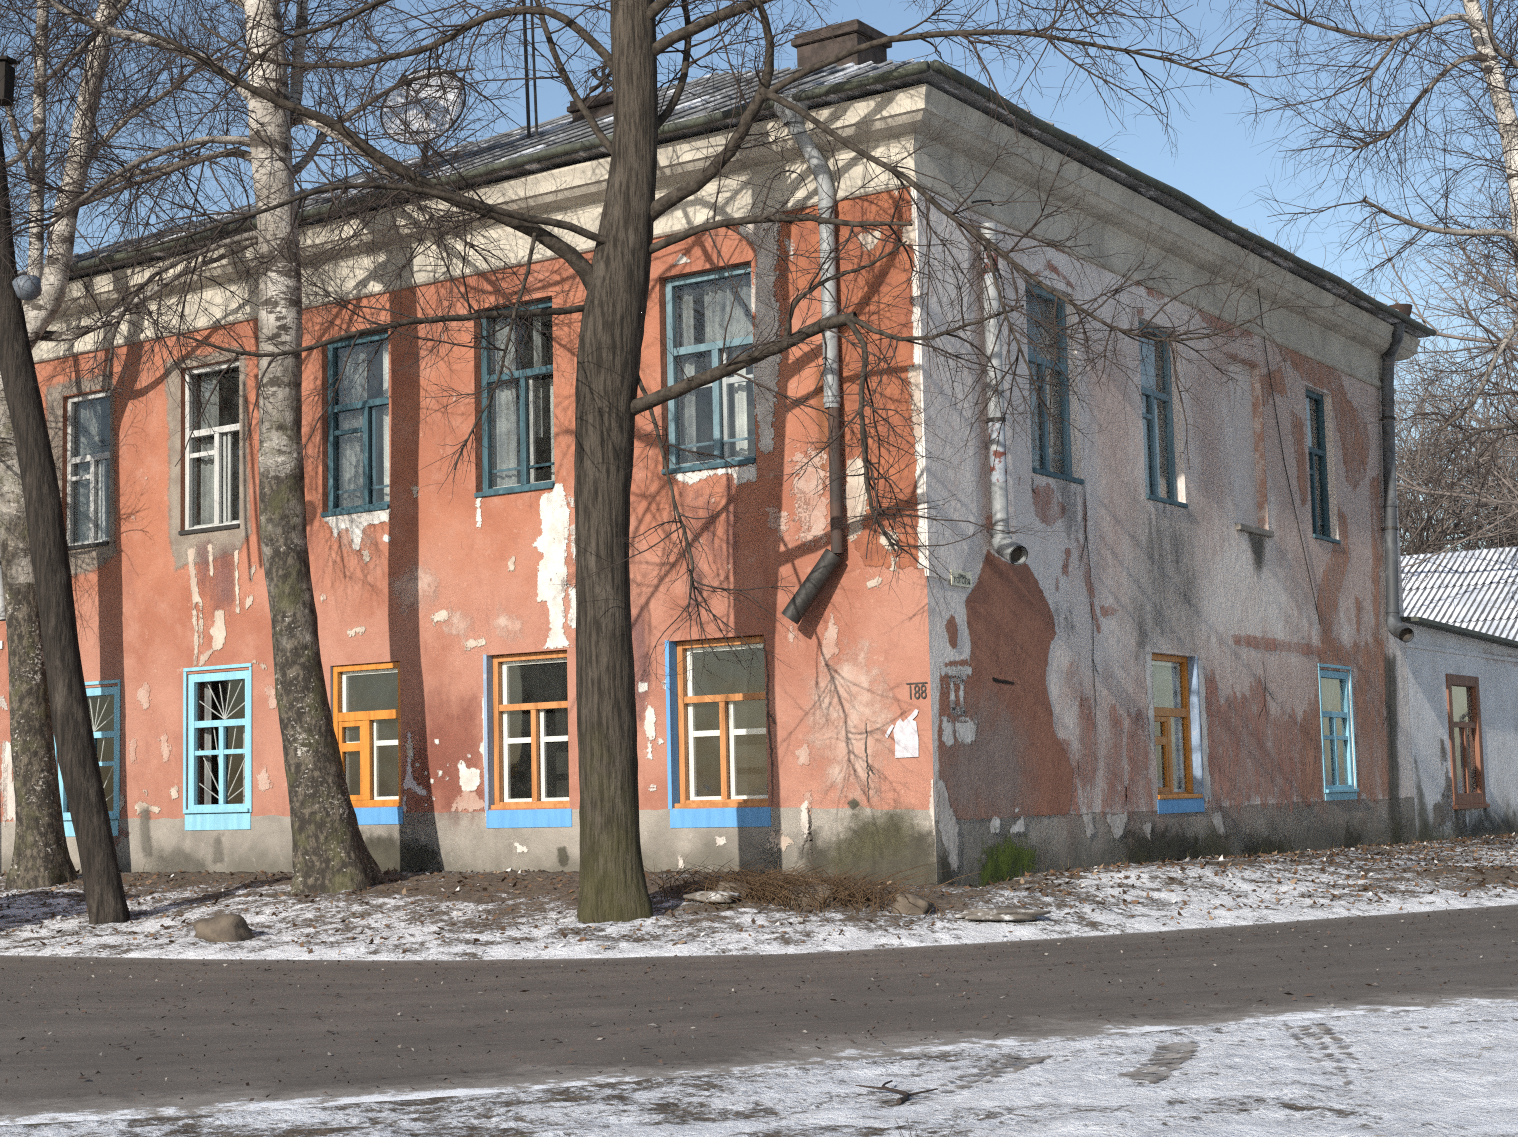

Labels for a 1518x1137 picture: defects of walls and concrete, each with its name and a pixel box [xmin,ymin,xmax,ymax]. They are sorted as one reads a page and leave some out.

flaking render [673,186,926,589]
peeling [187,543,256,668]
peeling [323,509,391,563]
peeling [475,497,483,527]
peeling [532,483,576,649]
flaking render [1198,346,1390,837]
peeling [937,614,978,747]
flaking render [0,741,16,827]
flaking render [402,699,489,816]
damp [801,816,936,886]
peeling [990,807,1026,834]
flaking render [1059,651,1155,840]